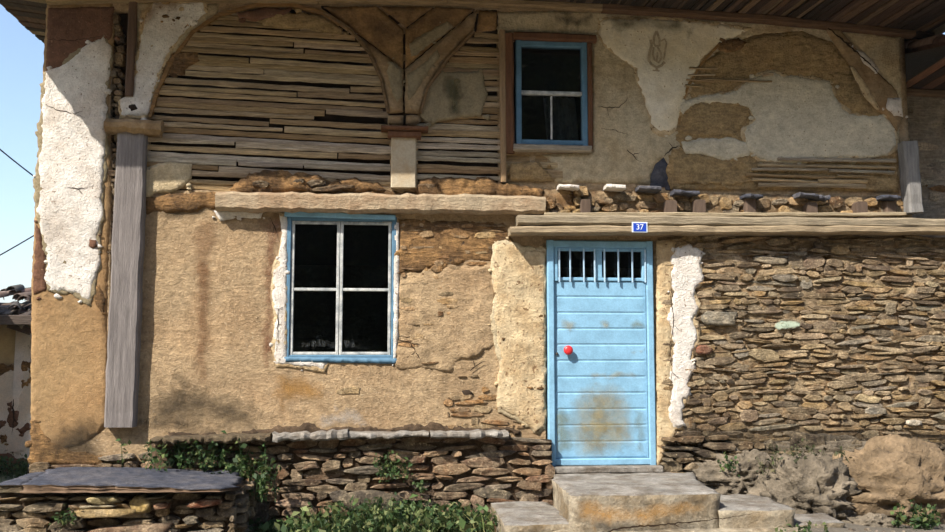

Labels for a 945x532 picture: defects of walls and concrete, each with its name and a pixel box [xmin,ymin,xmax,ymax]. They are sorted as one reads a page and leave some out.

flaking render [33,2,208,314]
flaking render [595,16,908,191]
flaking render [0,361,110,474]
flaking render [392,219,547,435]
flaking render [655,239,706,465]